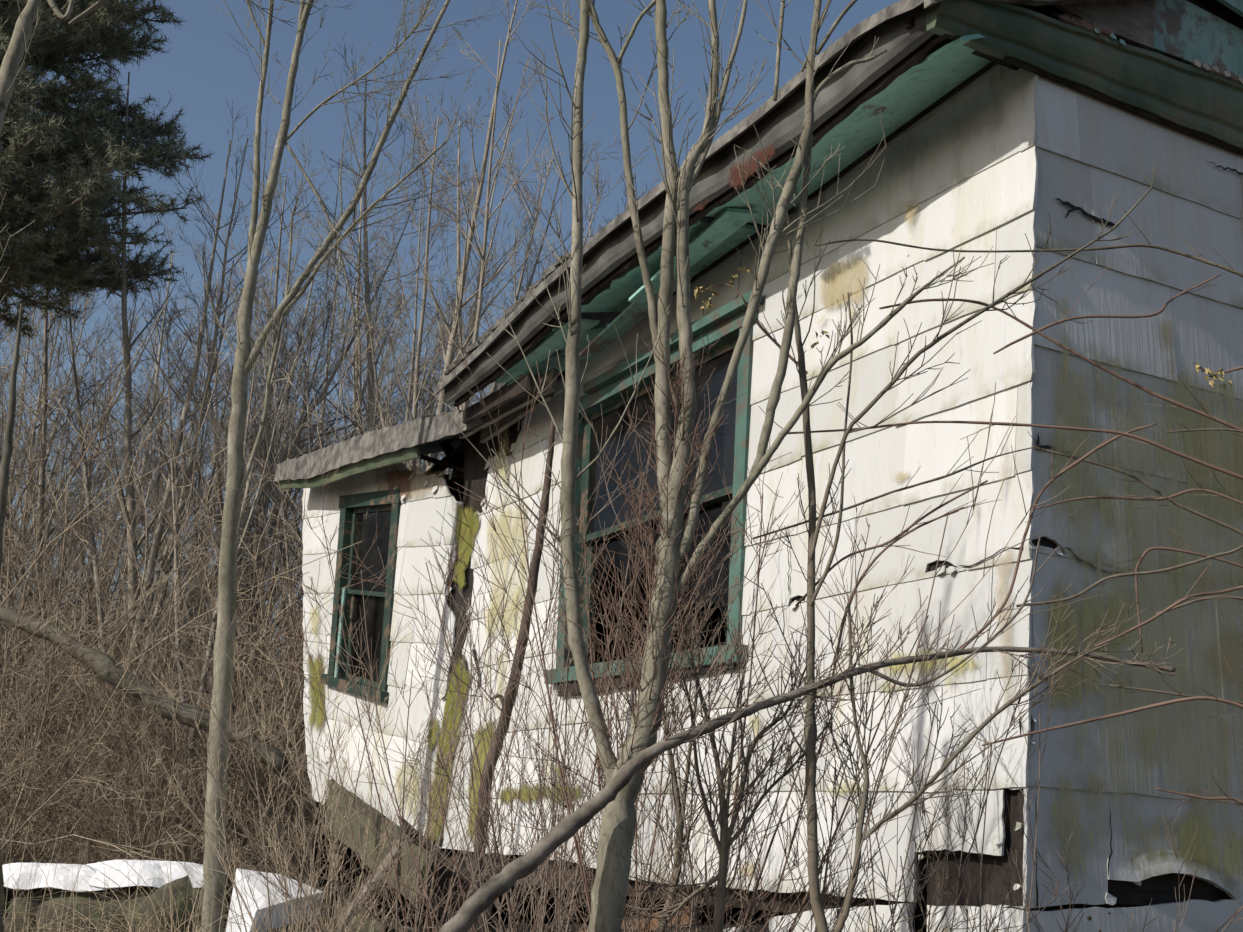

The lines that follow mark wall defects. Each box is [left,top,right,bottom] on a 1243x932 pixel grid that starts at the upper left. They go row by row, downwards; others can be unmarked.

crack [1207,161,1243,175]
crack [1055,198,1119,226]
leakage [821,260,865,320]
peeling [1105,892,1117,905]